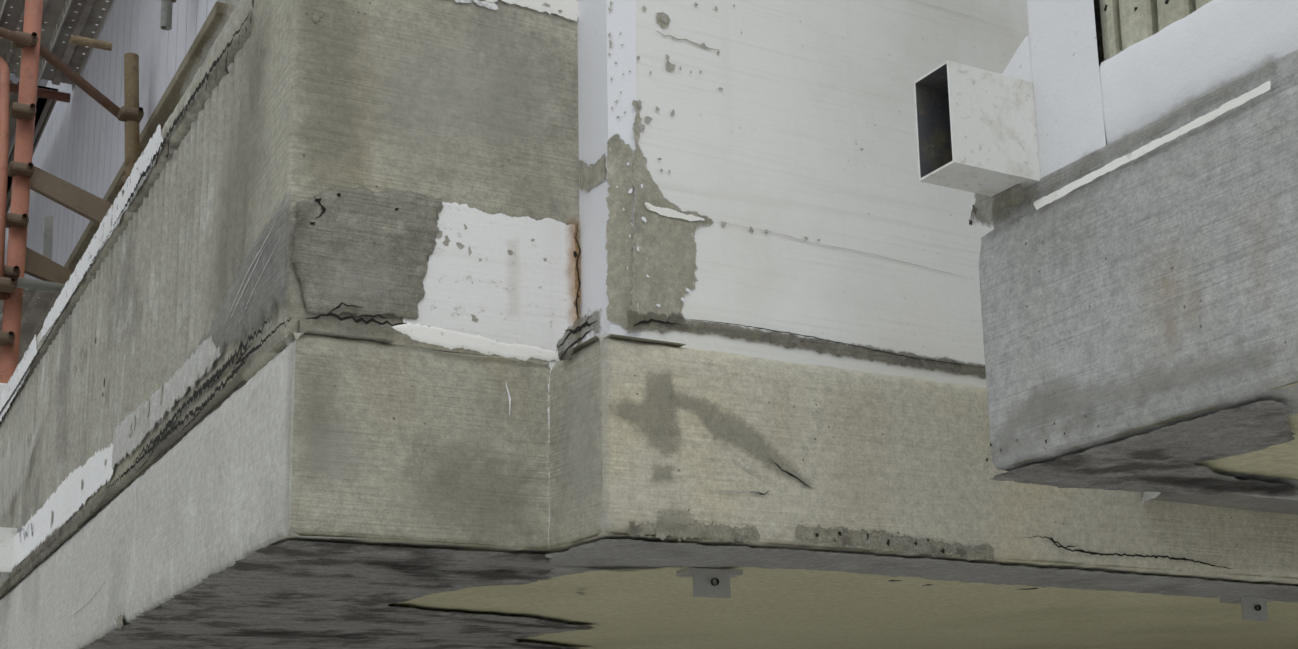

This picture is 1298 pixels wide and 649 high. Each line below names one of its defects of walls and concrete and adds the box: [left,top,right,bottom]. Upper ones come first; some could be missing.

peeling [454,0,579,22]
peeling [642,6,671,29]
crack [0,12,252,414]
crack [106,302,406,490]
peeling [403,201,577,351]
crack [547,316,597,542]
peeling [578,32,713,329]
crack [633,318,985,368]
peeling [11,443,113,569]
crack [1024,536,1232,569]